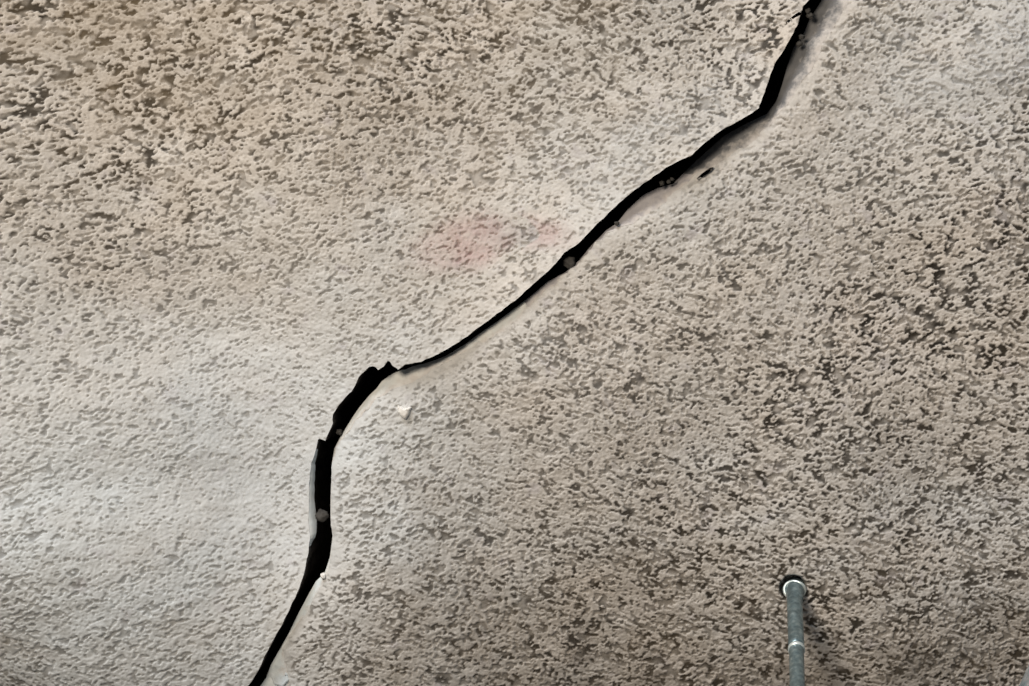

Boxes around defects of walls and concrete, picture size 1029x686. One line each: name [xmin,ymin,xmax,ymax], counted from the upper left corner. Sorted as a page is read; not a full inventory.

crack [248,0,848,686]